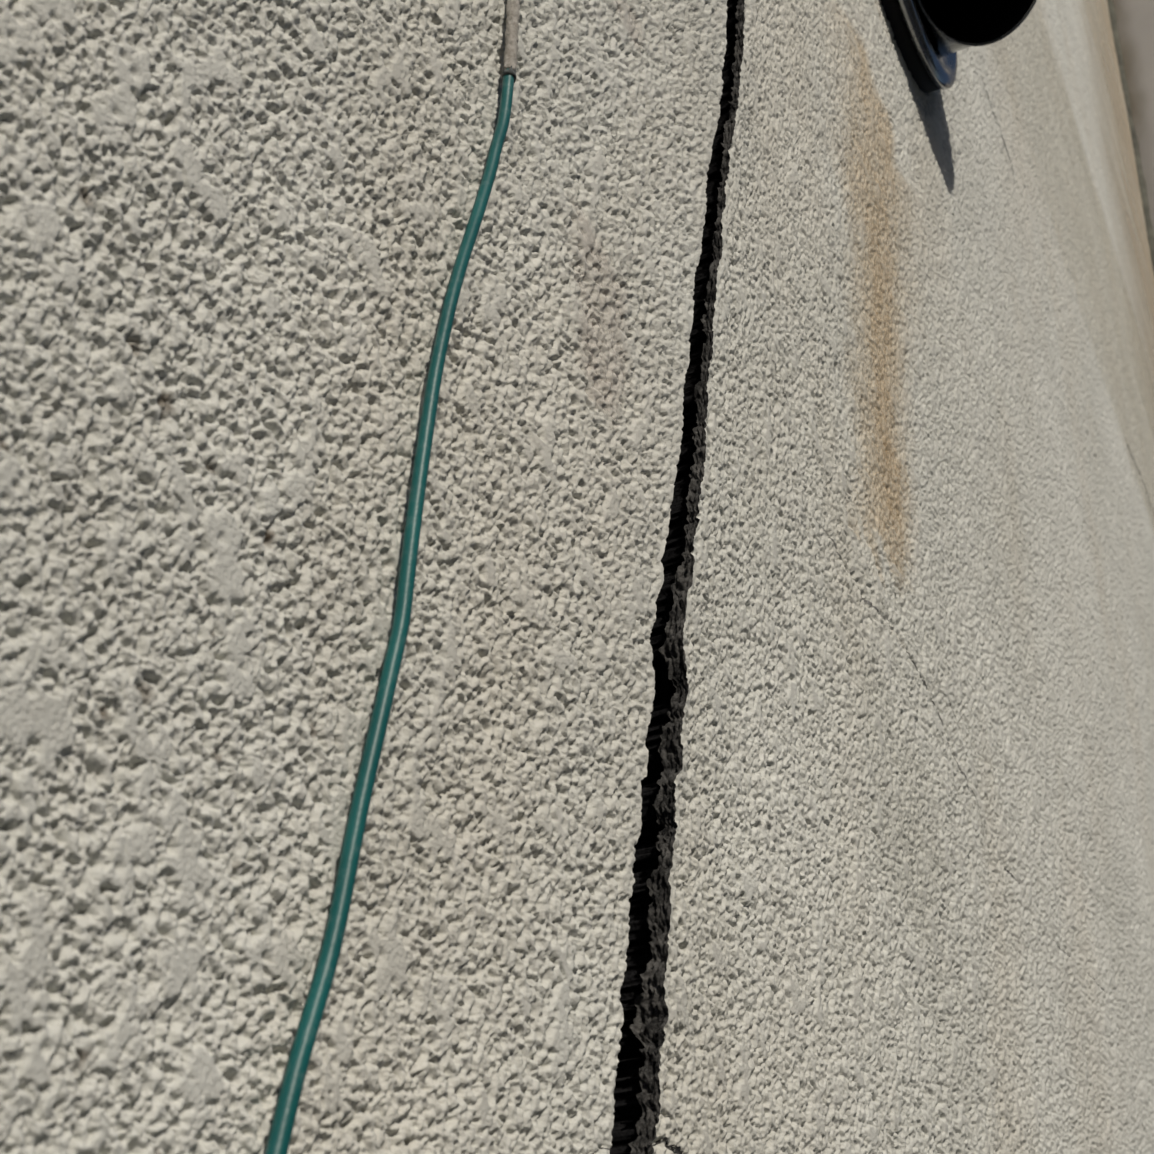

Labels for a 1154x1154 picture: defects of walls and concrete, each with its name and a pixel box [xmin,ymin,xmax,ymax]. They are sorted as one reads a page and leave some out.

crack [591,0,745,1154]